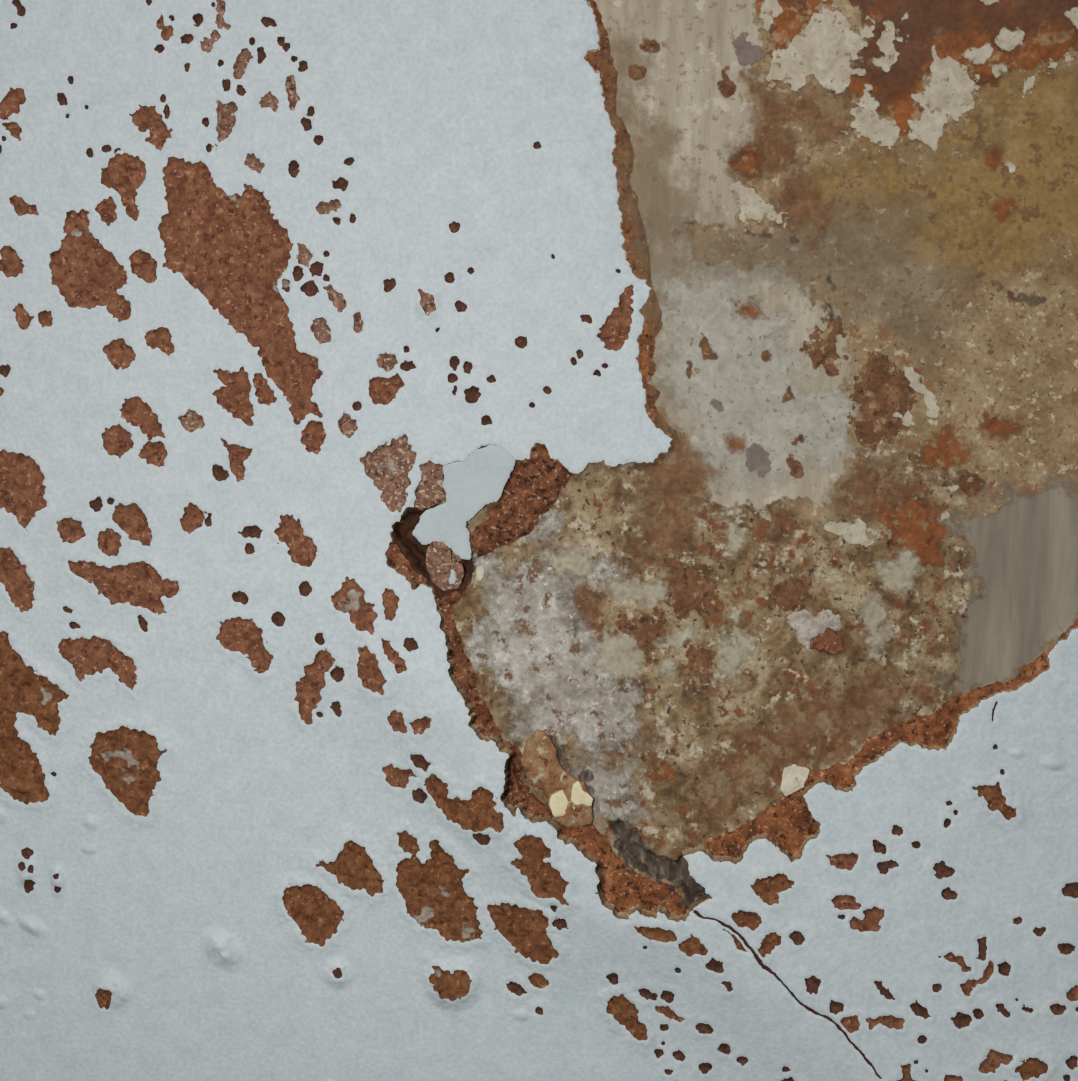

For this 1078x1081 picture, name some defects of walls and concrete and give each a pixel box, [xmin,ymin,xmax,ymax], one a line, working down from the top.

corrosion [628,65,647,80]
corrosion [640,39,660,53]
corrosion [717,0,1078,247]
spalling [49,0,363,455]
spalling [0,449,47,532]
spalling [57,496,179,632]
spalling [316,0,1078,1001]
spalling [0,631,69,805]
spalling [88,726,167,817]
spalling [282,884,344,947]
crack [693,910,882,1079]
peeling [1050,985,1078,1015]